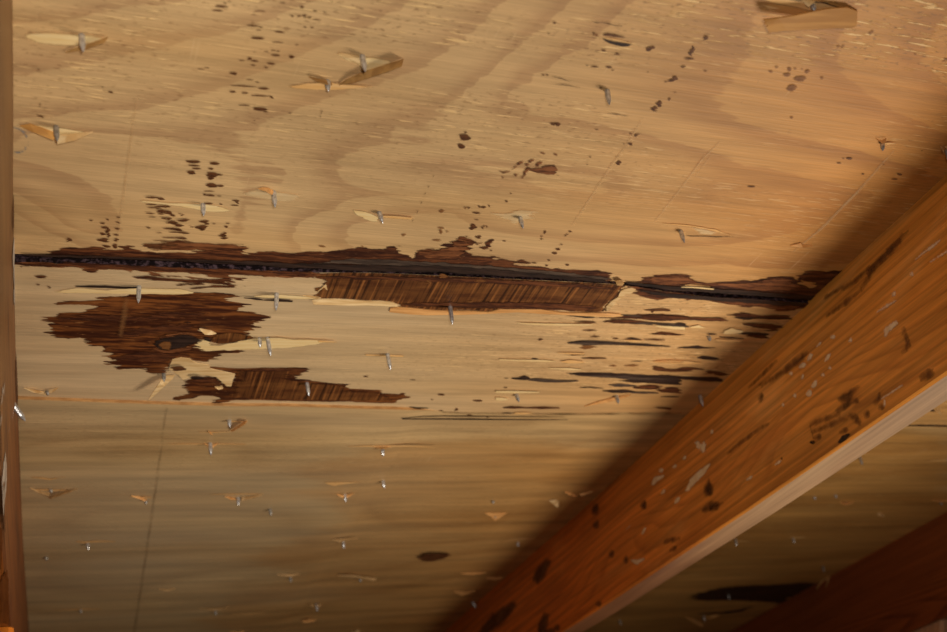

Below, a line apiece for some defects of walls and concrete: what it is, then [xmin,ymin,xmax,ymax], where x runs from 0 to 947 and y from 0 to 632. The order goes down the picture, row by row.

damp [186,160,239,206]
damp [13,197,614,303]
peeling [244,279,636,316]
damp [404,270,841,414]
peeling [169,357,235,390]
damp [0,356,18,532]
damp [825,412,869,443]